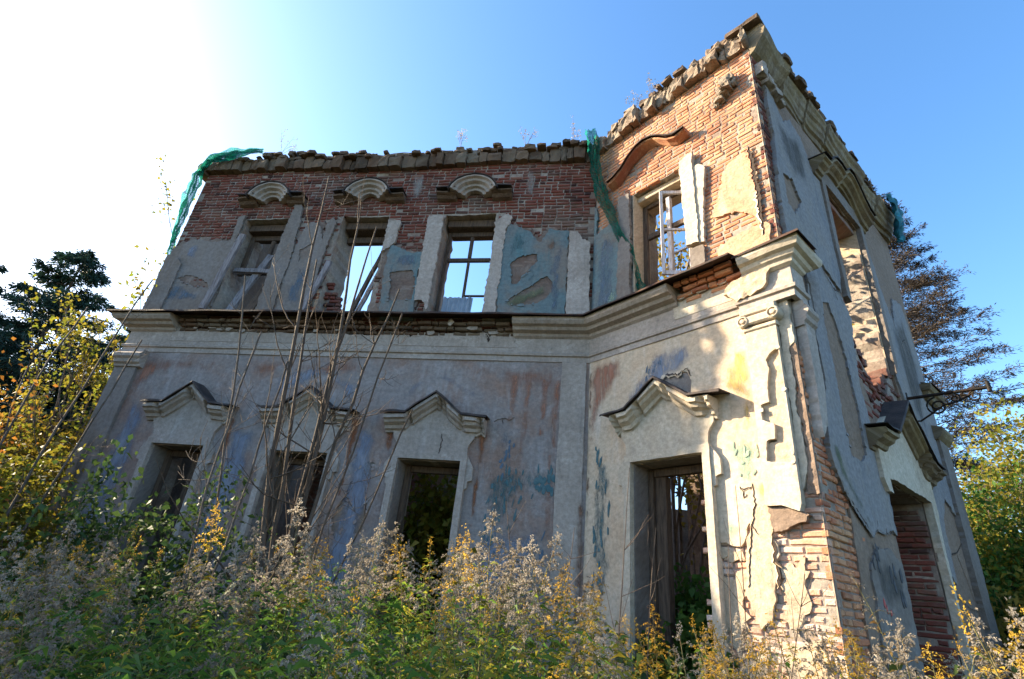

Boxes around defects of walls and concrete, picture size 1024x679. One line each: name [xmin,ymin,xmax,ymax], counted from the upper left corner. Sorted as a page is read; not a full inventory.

peeling [635,349,691,396]
peeling [728,354,746,393]
peeling [731,343,821,533]
peeling [477,440,555,608]
peeling [590,447,610,595]
crack [739,483,782,589]